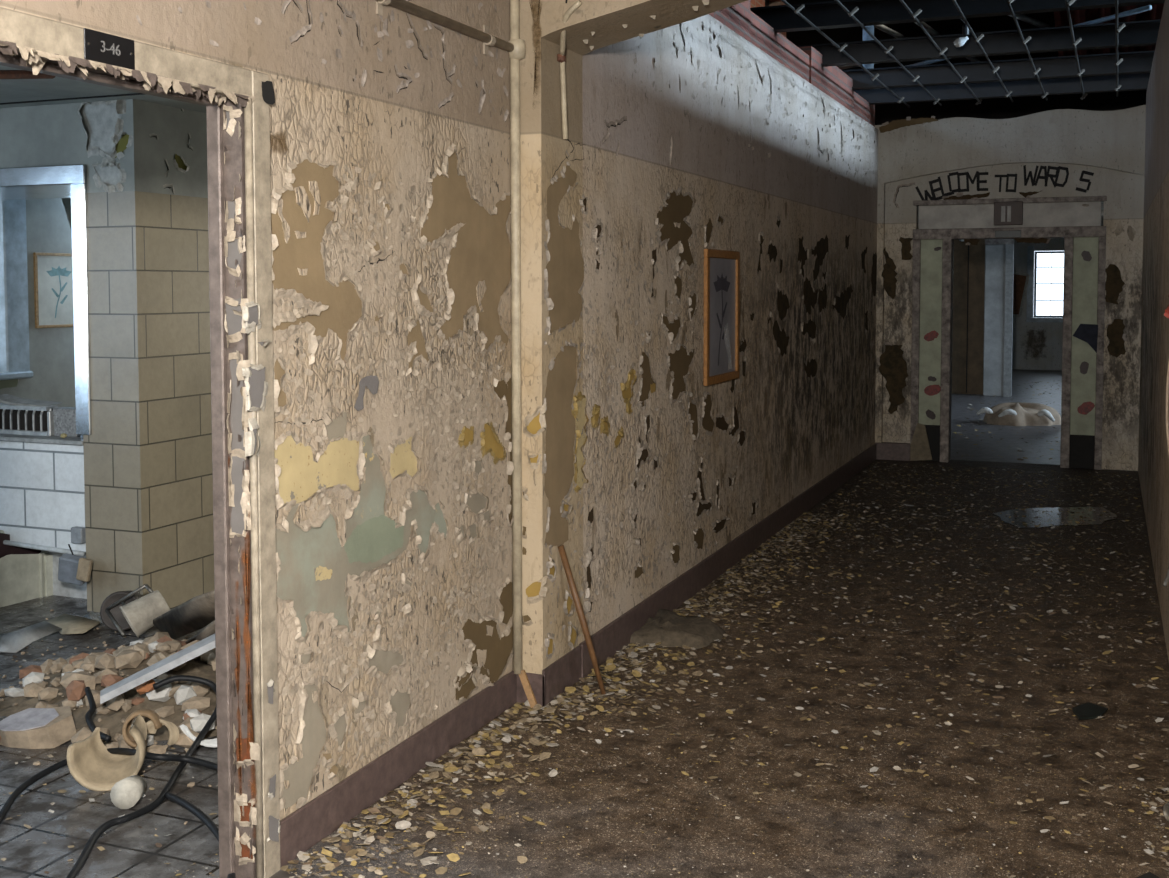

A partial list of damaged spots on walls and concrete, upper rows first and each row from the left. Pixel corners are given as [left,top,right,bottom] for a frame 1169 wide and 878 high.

peeling [77,99,133,194]
peeling [0,40,256,164]
crack [281,0,509,122]
peeling [750,231,853,356]
peeling [861,237,913,334]
peeling [0,379,19,389]
peeling [620,186,747,546]
peeling [224,143,624,859]
peeling [634,562,645,578]
peeling [321,642,679,866]